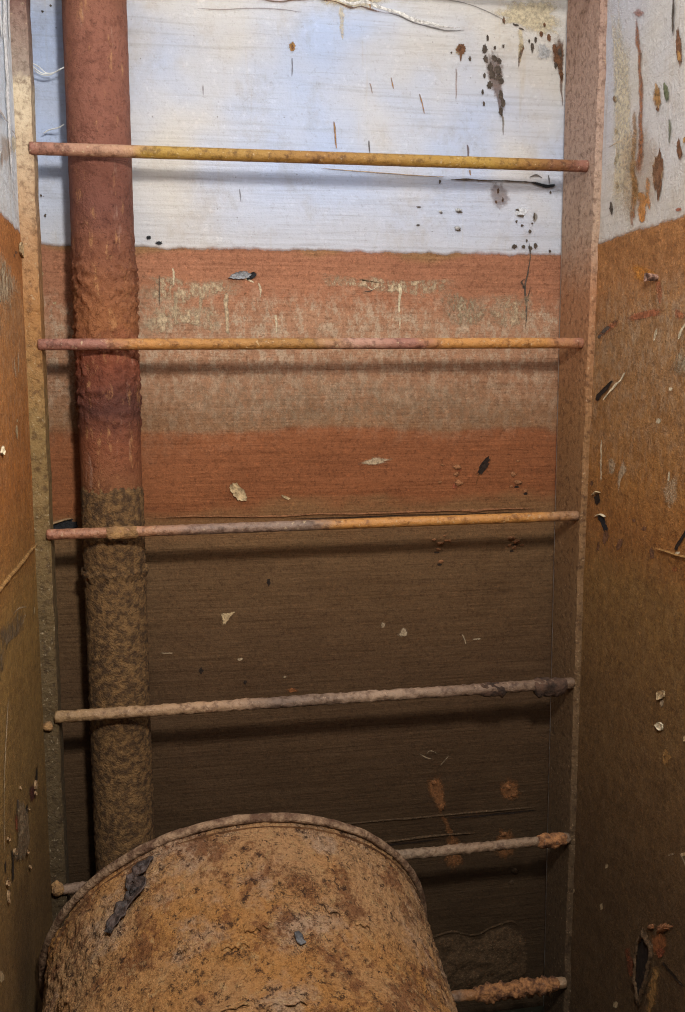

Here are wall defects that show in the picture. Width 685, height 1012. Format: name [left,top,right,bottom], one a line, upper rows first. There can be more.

rust [630,22,650,225]
damp [41,244,89,710]
damp [135,208,561,982]
spalling [5,766,38,904]
damp [62,721,96,912]
rust [428,778,462,867]
damp [451,985,543,1012]
spalling [632,923,683,1012]